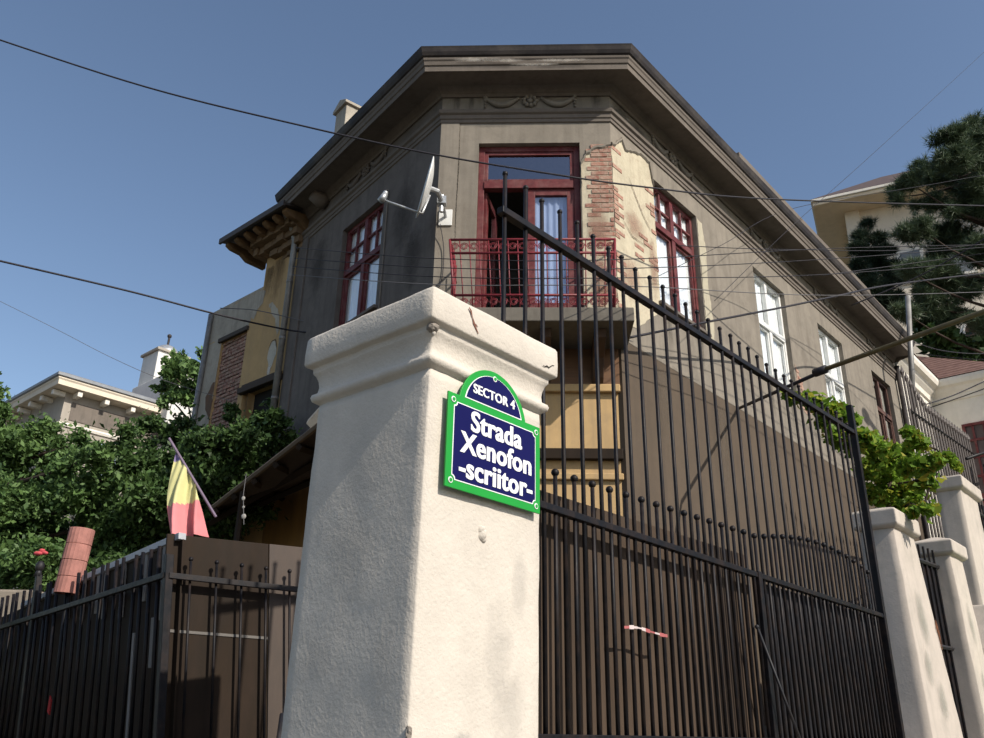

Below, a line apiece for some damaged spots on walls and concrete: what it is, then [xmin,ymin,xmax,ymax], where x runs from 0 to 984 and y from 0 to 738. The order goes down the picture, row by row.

flaking render [581,137,661,328]